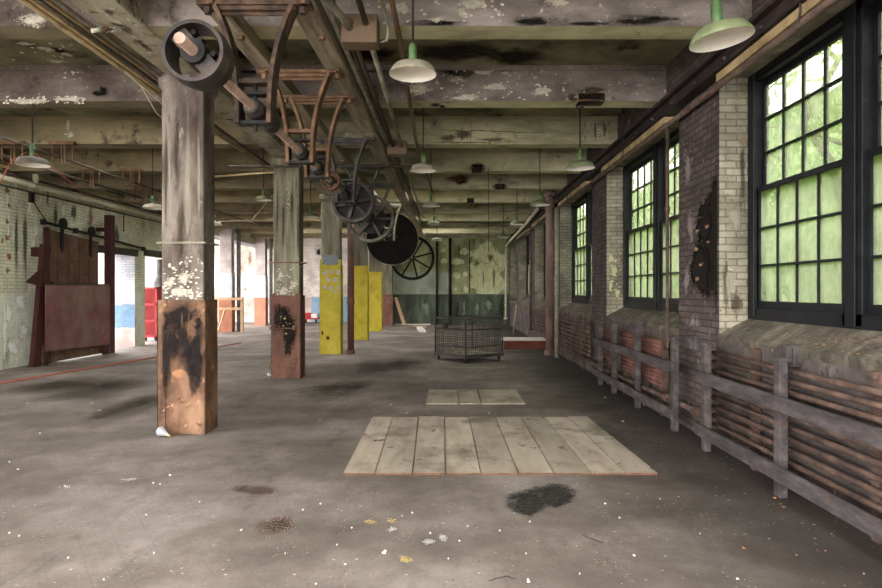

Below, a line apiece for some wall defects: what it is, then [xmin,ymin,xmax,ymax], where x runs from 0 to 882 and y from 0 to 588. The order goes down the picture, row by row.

peeling [13,14,46,29]
peeling [366,1,444,23]
peeling [457,0,504,21]
peeling [3,95,85,104]
peeling [409,70,551,108]
peeling [686,200,710,251]
peeling [162,256,203,300]
peeling [276,266,301,295]
peeling [322,269,341,294]
peeling [683,263,703,298]